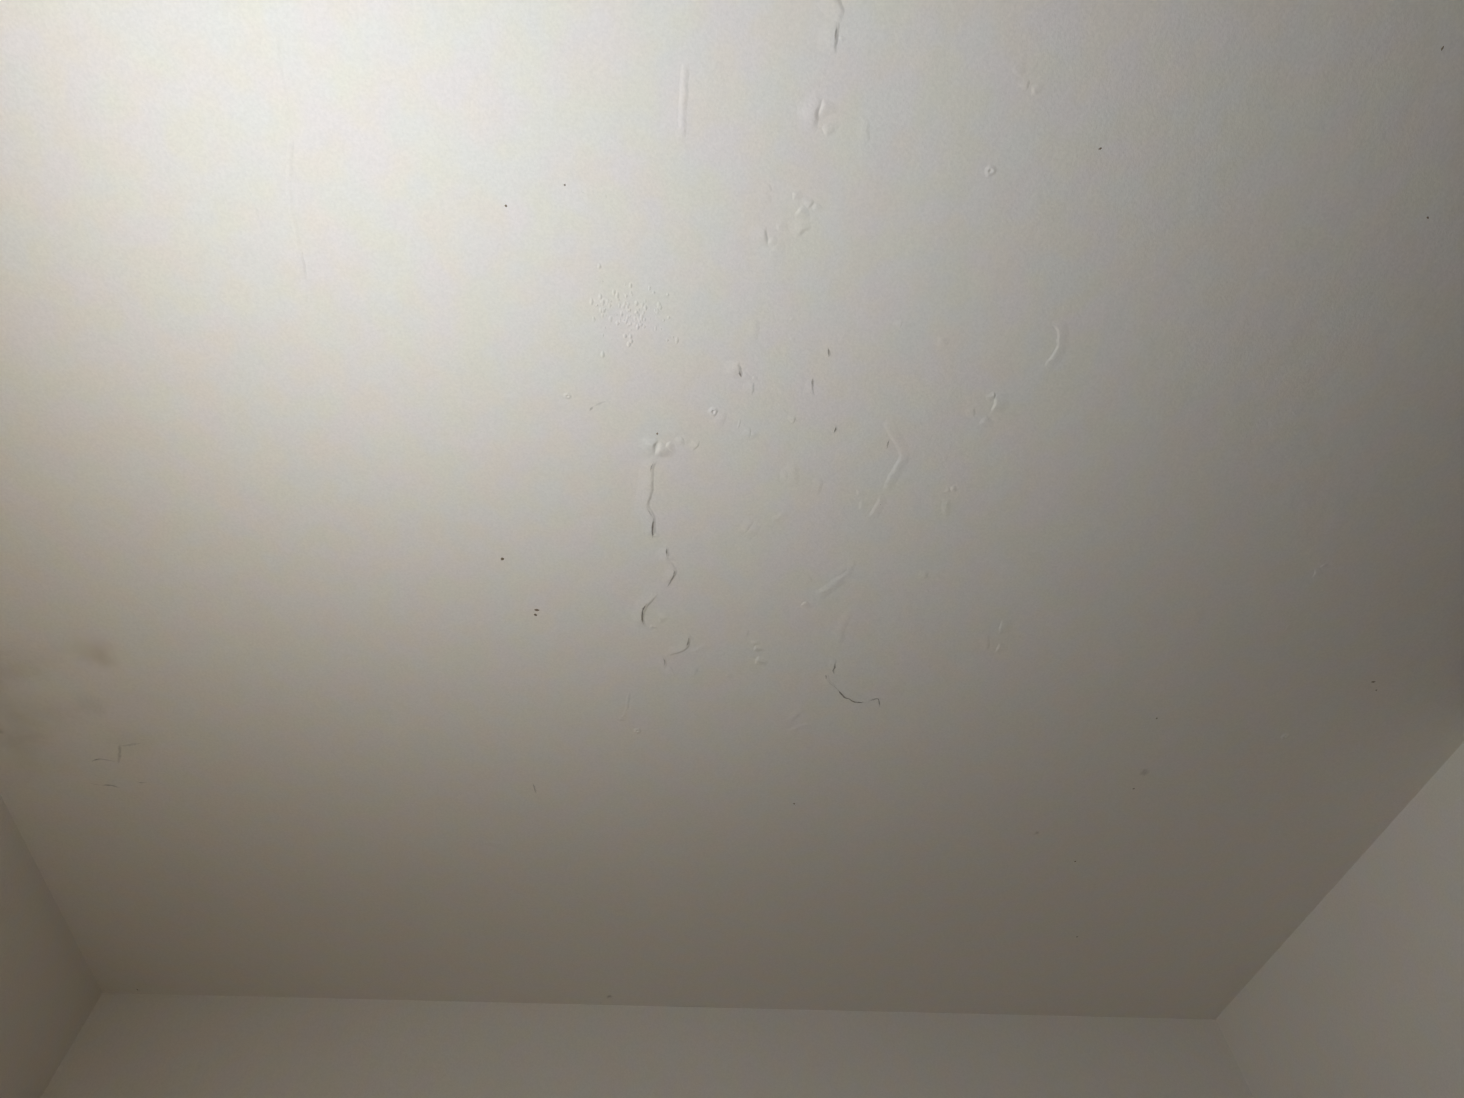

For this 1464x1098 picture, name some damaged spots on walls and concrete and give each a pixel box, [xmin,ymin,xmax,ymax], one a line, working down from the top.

crack [630,459,691,676]